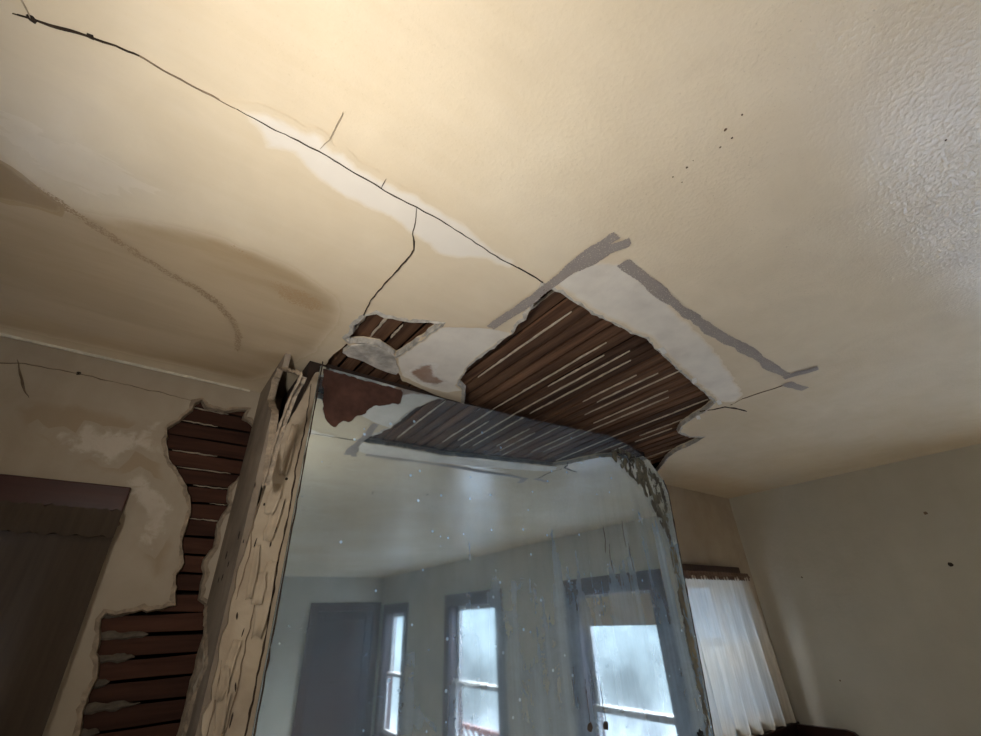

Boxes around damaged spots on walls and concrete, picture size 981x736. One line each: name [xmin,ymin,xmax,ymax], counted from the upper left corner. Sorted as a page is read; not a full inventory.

damp [0,159,349,383]
crack [12,0,543,316]
spalling [327,310,445,392]
spalling [457,232,819,472]
spalling [28,398,254,736]